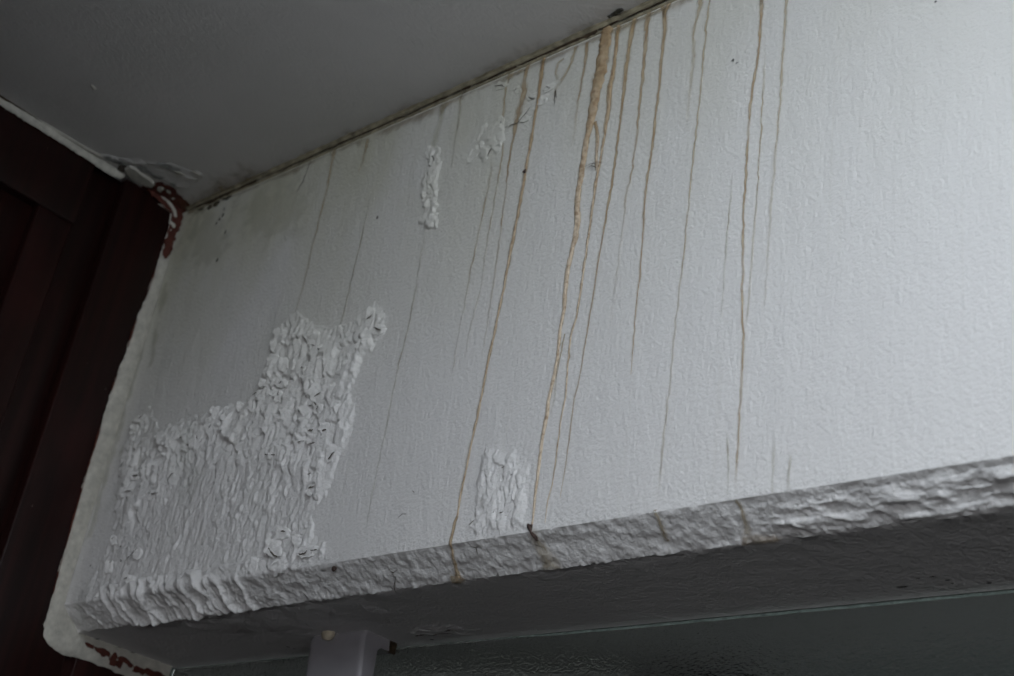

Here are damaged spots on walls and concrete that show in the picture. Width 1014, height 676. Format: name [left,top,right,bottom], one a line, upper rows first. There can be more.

leakage [693,0,710,71]